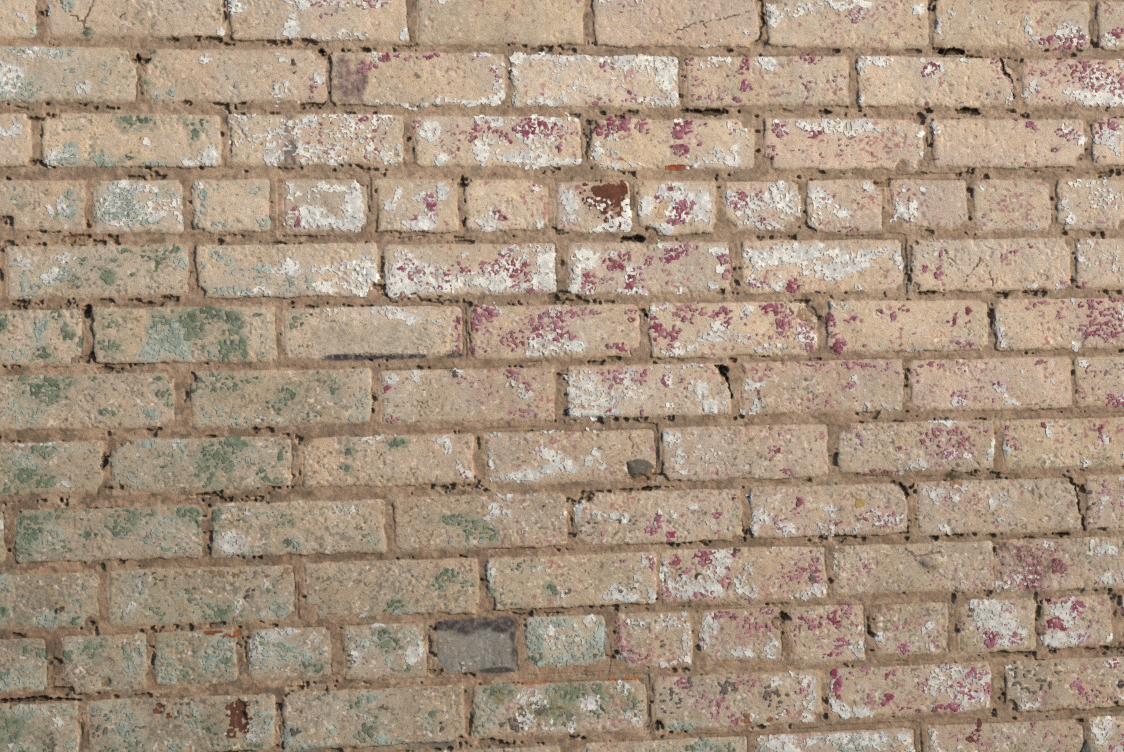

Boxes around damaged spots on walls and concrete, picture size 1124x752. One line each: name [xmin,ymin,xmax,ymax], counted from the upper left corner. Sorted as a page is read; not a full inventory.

peeling [282,0,390,41]
peeling [979,15,1124,162]
peeling [10,179,227,297]
peeling [139,39,974,433]
peeling [1056,280,1124,407]
peeling [195,387,297,488]
peeling [424,367,607,545]
peeling [0,501,302,558]
peeling [733,492,805,554]
peeling [525,499,992,752]
peeling [961,540,1096,648]
peeling [1067,667,1124,752]